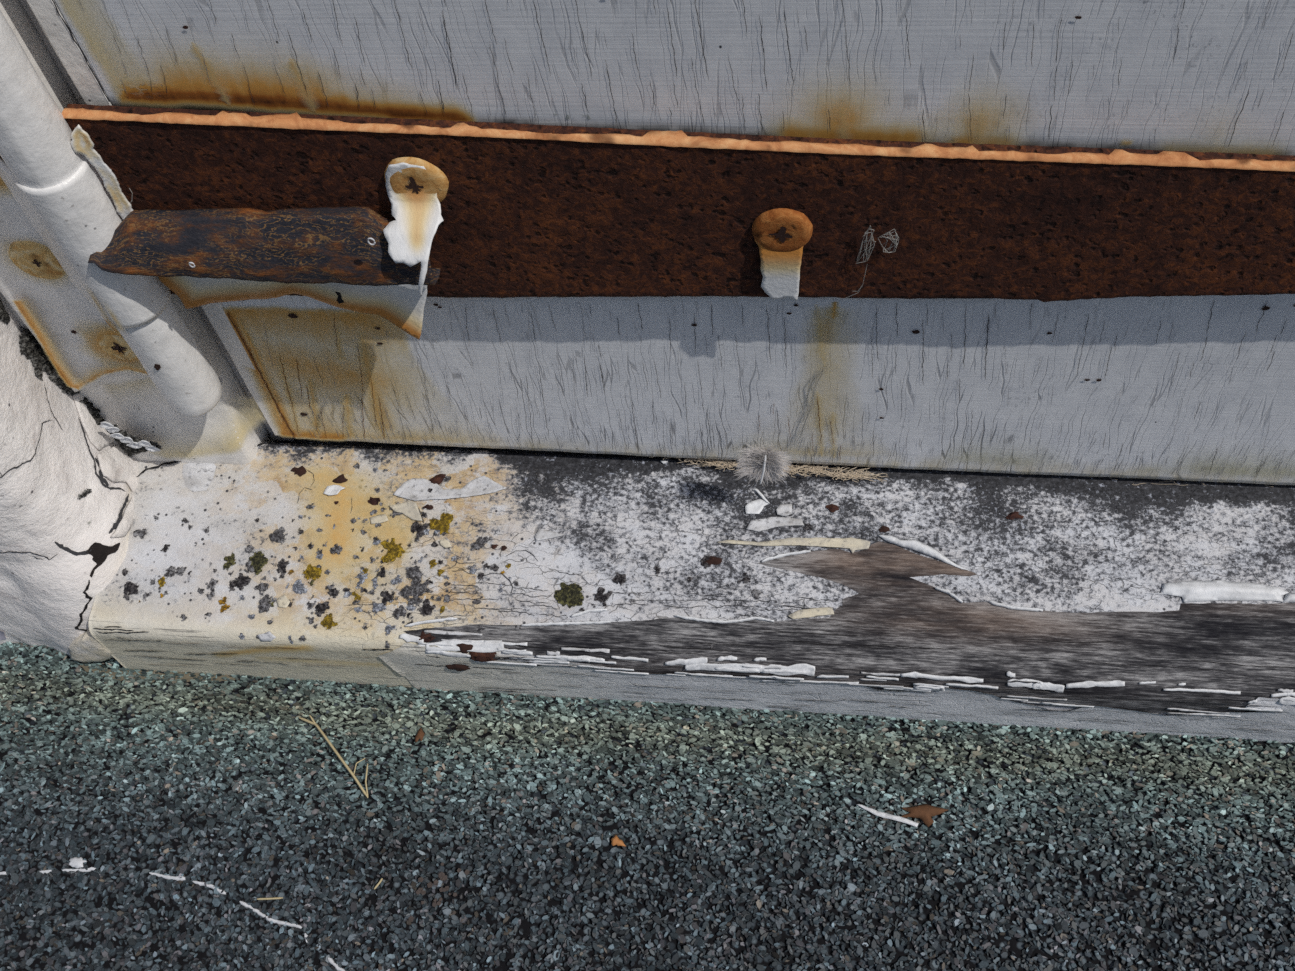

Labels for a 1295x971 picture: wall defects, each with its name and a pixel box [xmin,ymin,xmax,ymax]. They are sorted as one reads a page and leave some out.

corrosion [61,0,475,122]
corrosion [778,96,927,142]
corrosion [949,110,1013,145]
peeling [71,124,444,340]
corrosion [13,294,161,390]
corrosion [162,300,429,457]
crack [0,384,512,670]
peeling [323,485,345,496]
peeling [370,475,506,524]
spalling [0,488,1295,971]